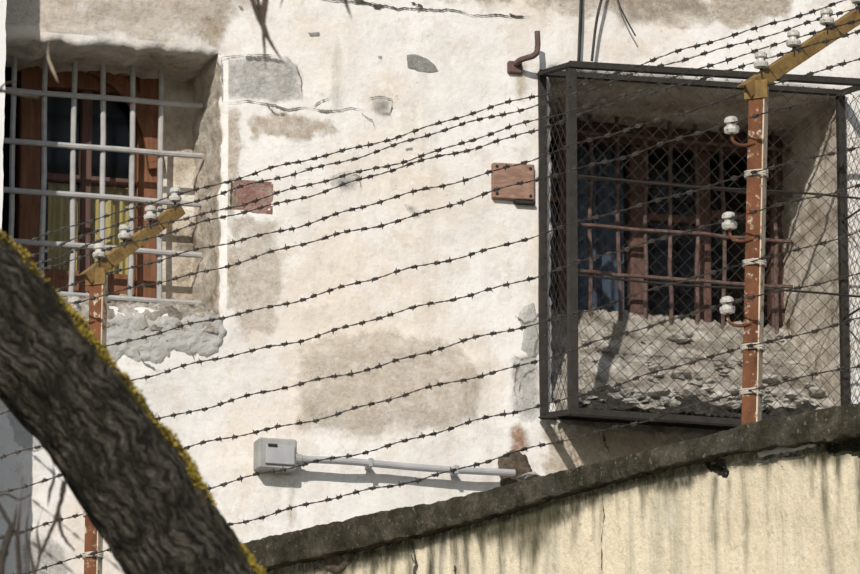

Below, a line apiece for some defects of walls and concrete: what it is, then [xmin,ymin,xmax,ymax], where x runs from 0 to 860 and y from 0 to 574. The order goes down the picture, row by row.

crack [332,0,533,17]
crack [220,54,393,130]
spalling [106,312,227,364]
water stain [545,425,705,475]
water stain [267,439,860,574]
crack [410,544,418,574]